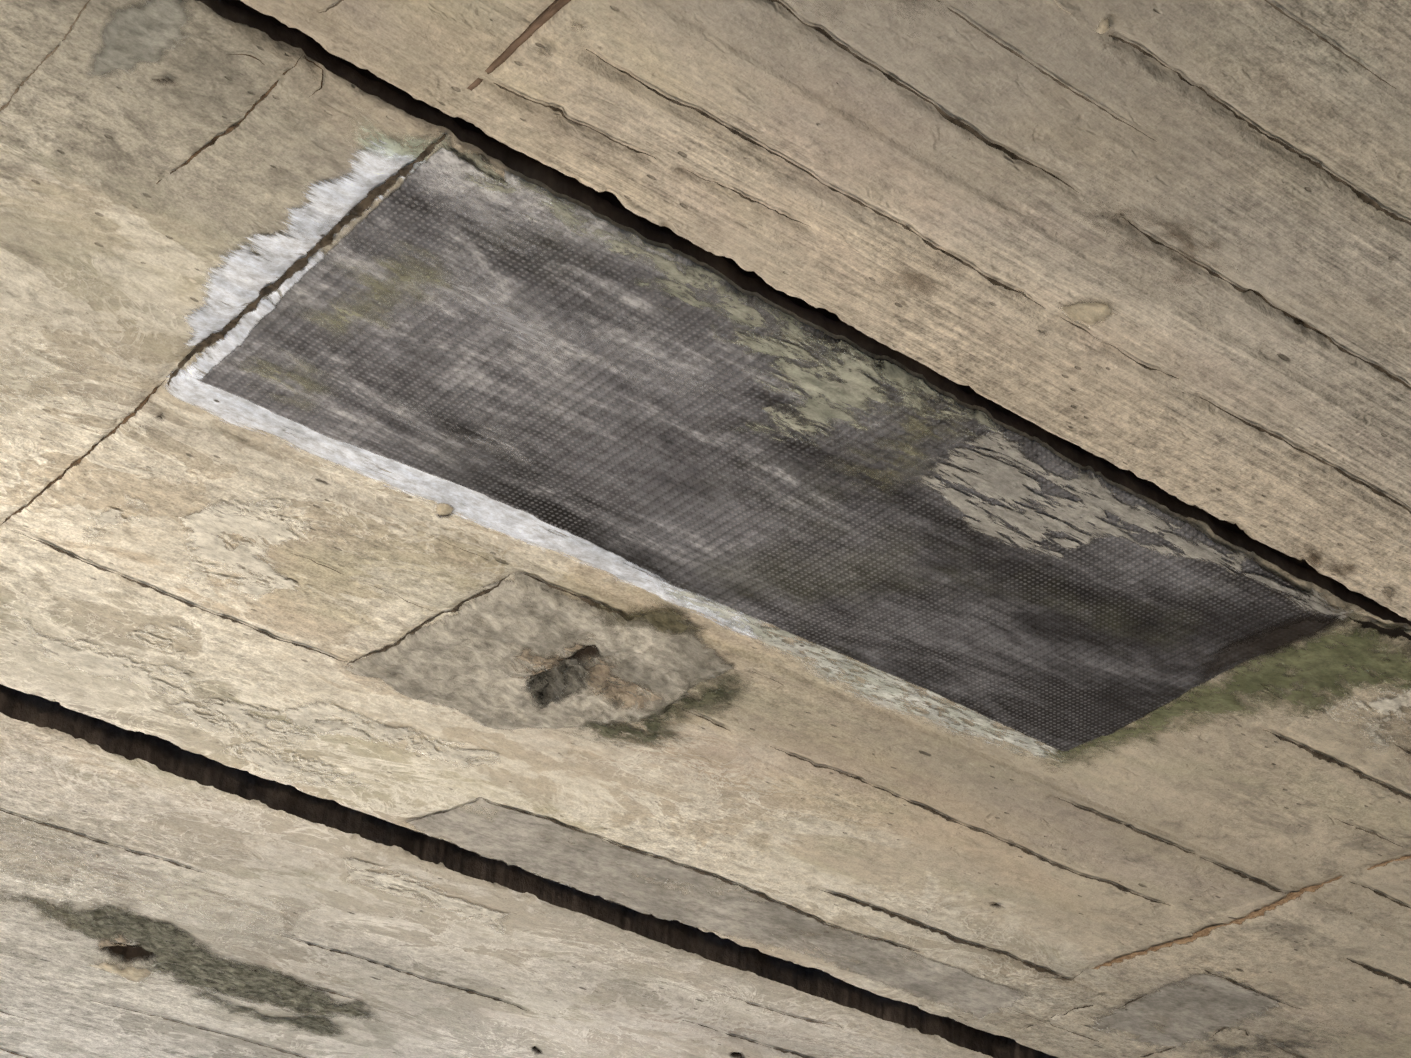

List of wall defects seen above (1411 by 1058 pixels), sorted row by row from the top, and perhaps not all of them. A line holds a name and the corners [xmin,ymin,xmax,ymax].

crack [156,54,323,184]
spalling [512,644,663,710]